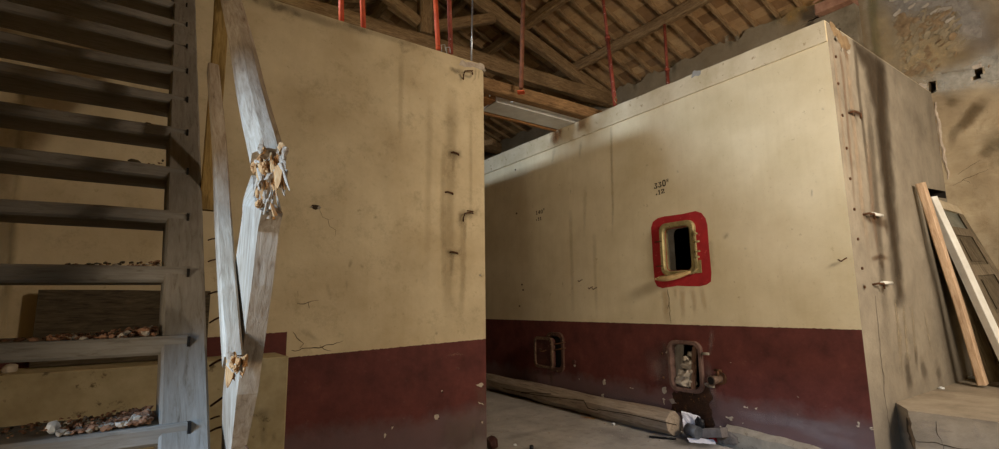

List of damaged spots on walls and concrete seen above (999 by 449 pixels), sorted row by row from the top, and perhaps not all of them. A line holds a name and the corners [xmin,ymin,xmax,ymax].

peeling [889,0,982,90]
crack [292,332,342,351]
crack [875,296,961,449]